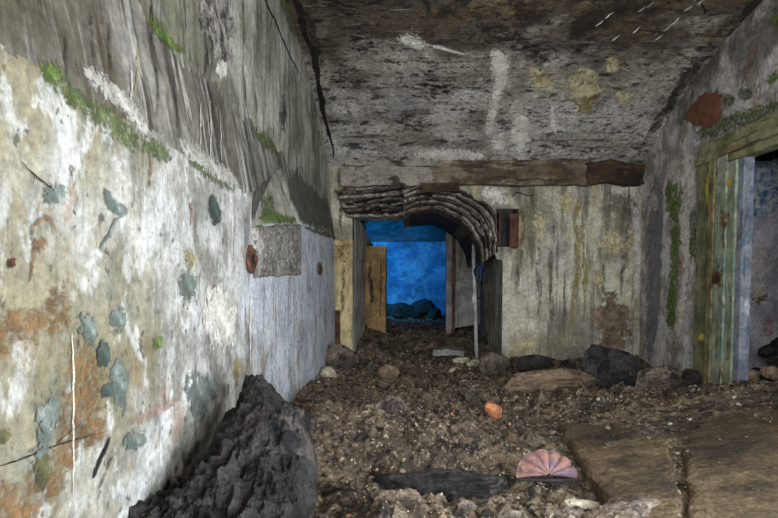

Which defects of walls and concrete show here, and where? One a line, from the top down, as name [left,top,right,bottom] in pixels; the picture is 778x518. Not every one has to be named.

water stain [83,3,151,140]
crack [265,0,334,158]
water stain [413,0,549,161]
water stain [548,105,558,134]
water stain [561,0,669,53]
corrosion [0,287,73,359]
water stain [512,329,545,356]
water stain [558,190,587,335]
water stain [597,178,665,360]